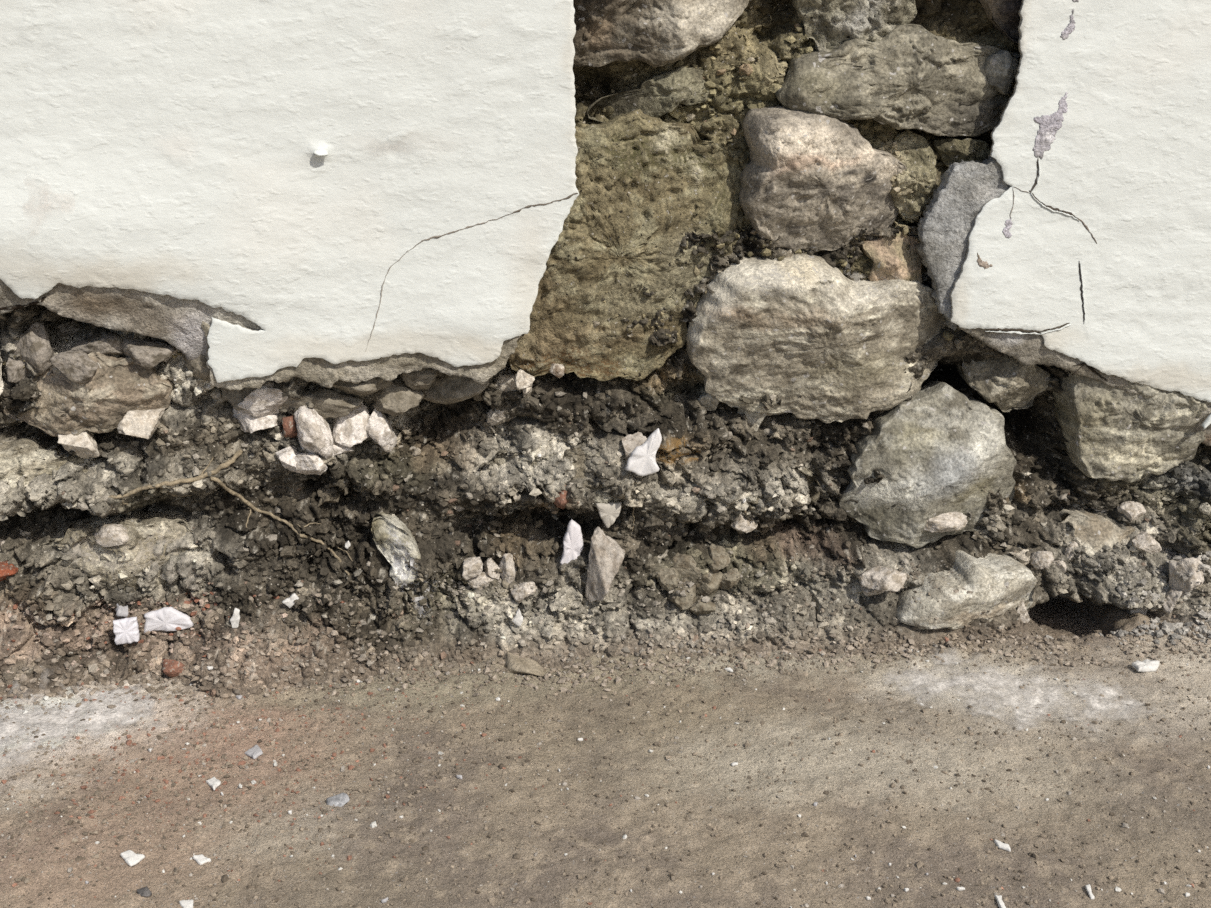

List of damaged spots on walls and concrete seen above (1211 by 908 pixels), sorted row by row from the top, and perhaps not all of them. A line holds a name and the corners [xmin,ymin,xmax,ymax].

crack [368,193,578,342]
flaking render [0,0,1211,703]
crack [985,160,1097,335]